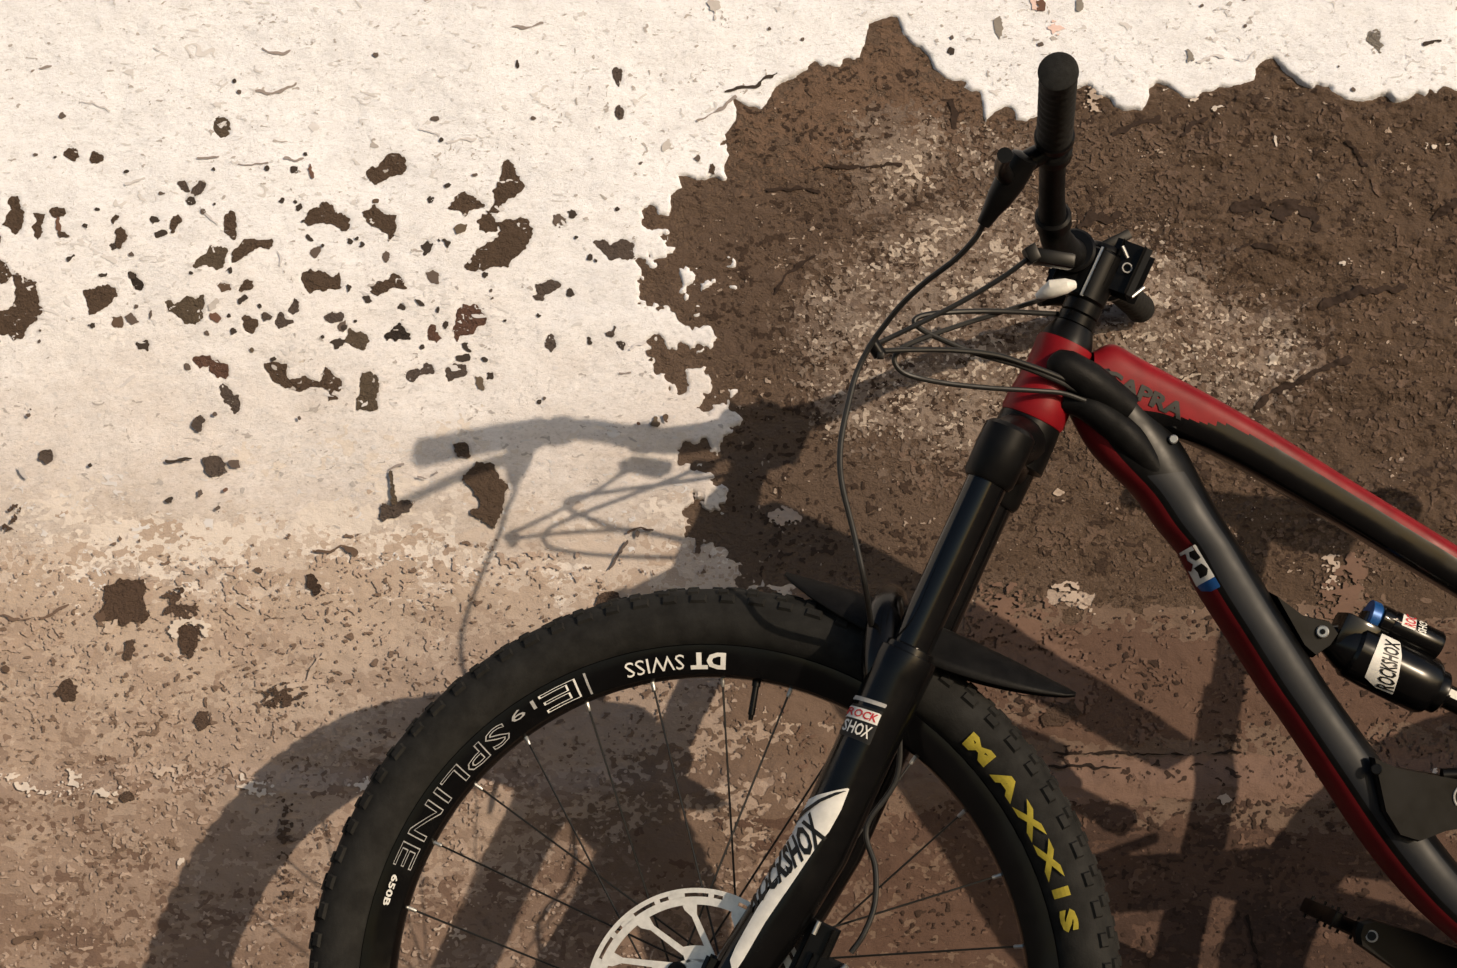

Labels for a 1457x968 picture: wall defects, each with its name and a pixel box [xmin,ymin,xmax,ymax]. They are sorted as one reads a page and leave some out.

spalling [1366,29,1384,53]
spalling [33,148,104,164]
spalling [553,209,636,262]
spalling [0,153,533,411]
spalling [533,279,575,318]
spalling [184,355,241,432]
spalling [197,455,240,512]
spalling [379,500,413,522]
spalling [453,442,509,529]
spalling [95,578,150,660]
spalling [168,616,211,659]
peeling [964,581,1102,714]